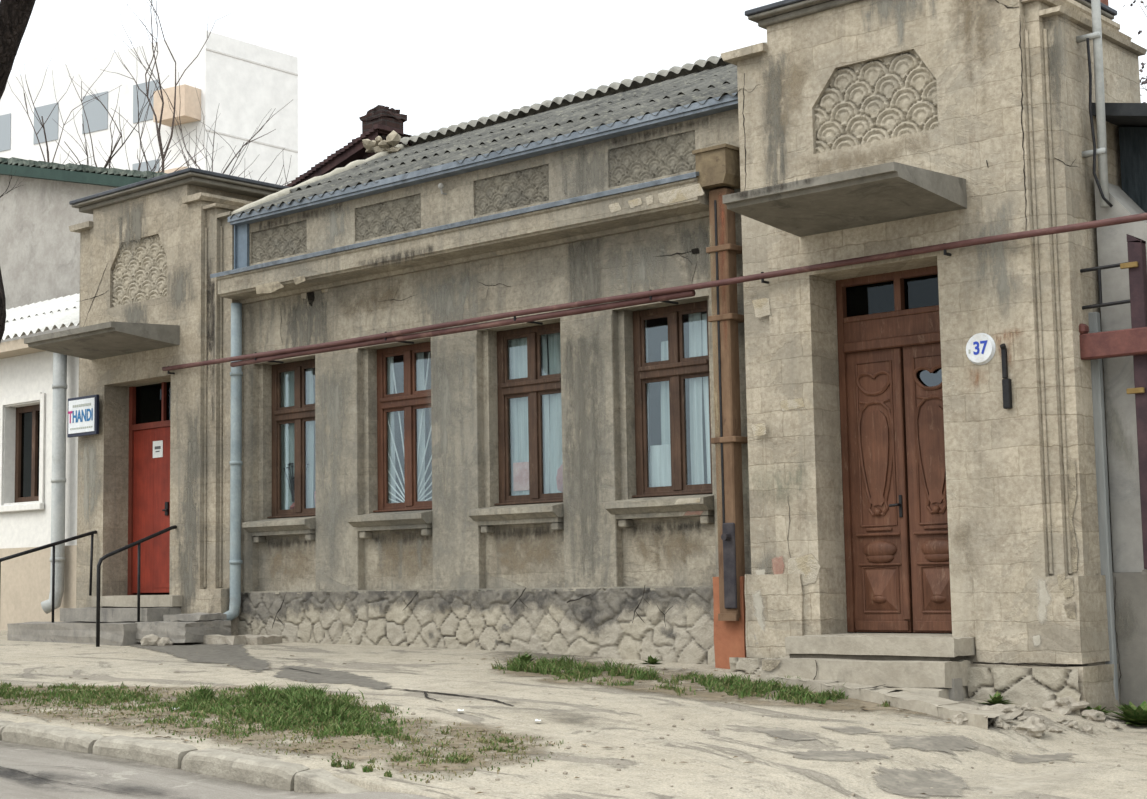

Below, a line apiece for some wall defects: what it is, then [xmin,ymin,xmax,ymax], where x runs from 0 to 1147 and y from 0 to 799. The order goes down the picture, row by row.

crack [740,73,748,187]
damp [767,57,803,191]
crack [653,248,699,280]
crack [632,586,673,626]